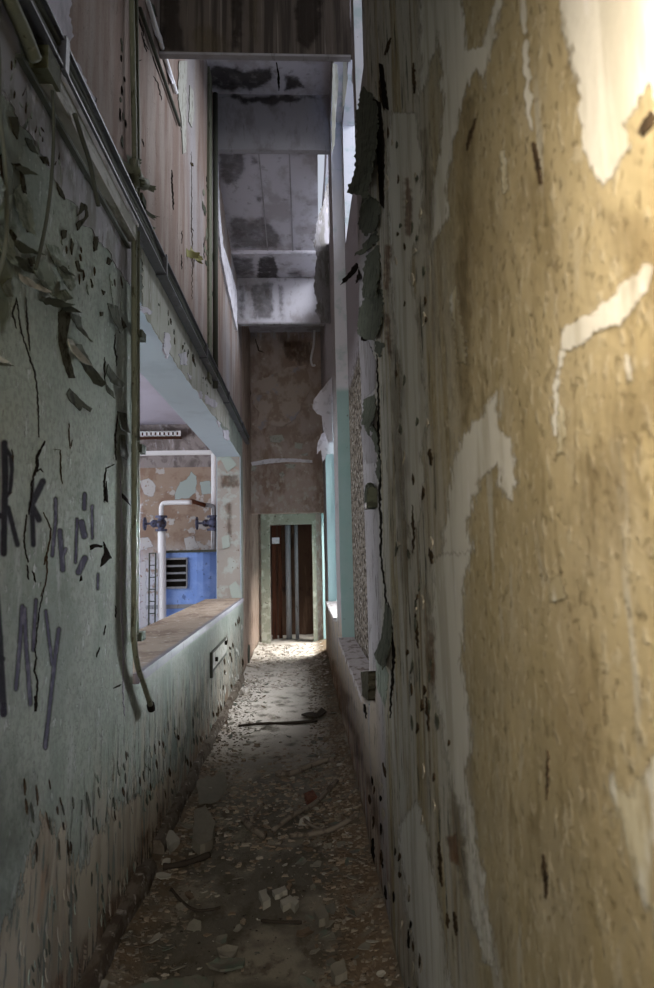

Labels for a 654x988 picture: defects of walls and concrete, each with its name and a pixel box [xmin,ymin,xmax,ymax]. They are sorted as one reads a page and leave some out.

flaking render [0,0,230,430]
water stain [220,154,243,184]
water stain [210,66,310,105]
water stain [231,218,298,318]
peeling [313,0,503,559]
peeling [551,263,654,454]
peeling [560,0,654,186]
crack [9,297,73,711]
peeling [139,537,153,629]
peeling [406,389,517,977]
flaking render [0,636,244,988]
peeling [608,753,654,932]